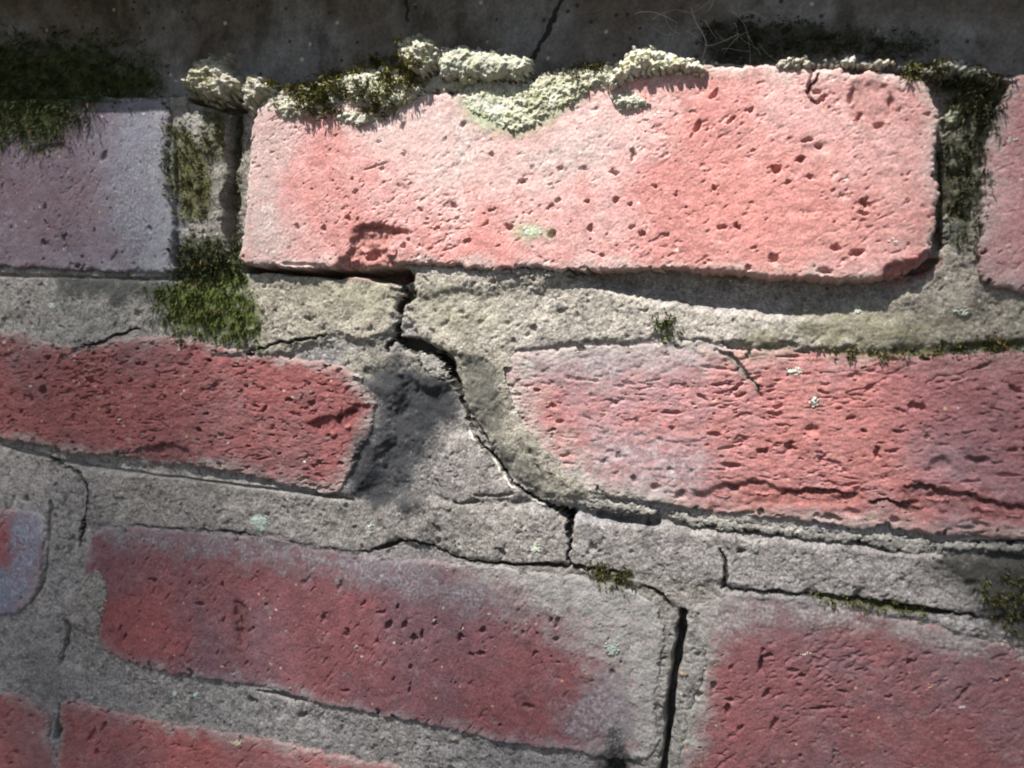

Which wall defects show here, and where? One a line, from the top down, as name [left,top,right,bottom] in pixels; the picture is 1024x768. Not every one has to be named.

crack [529,0,564,60]
water stain [353,353,499,514]
crack [647,586,670,603]